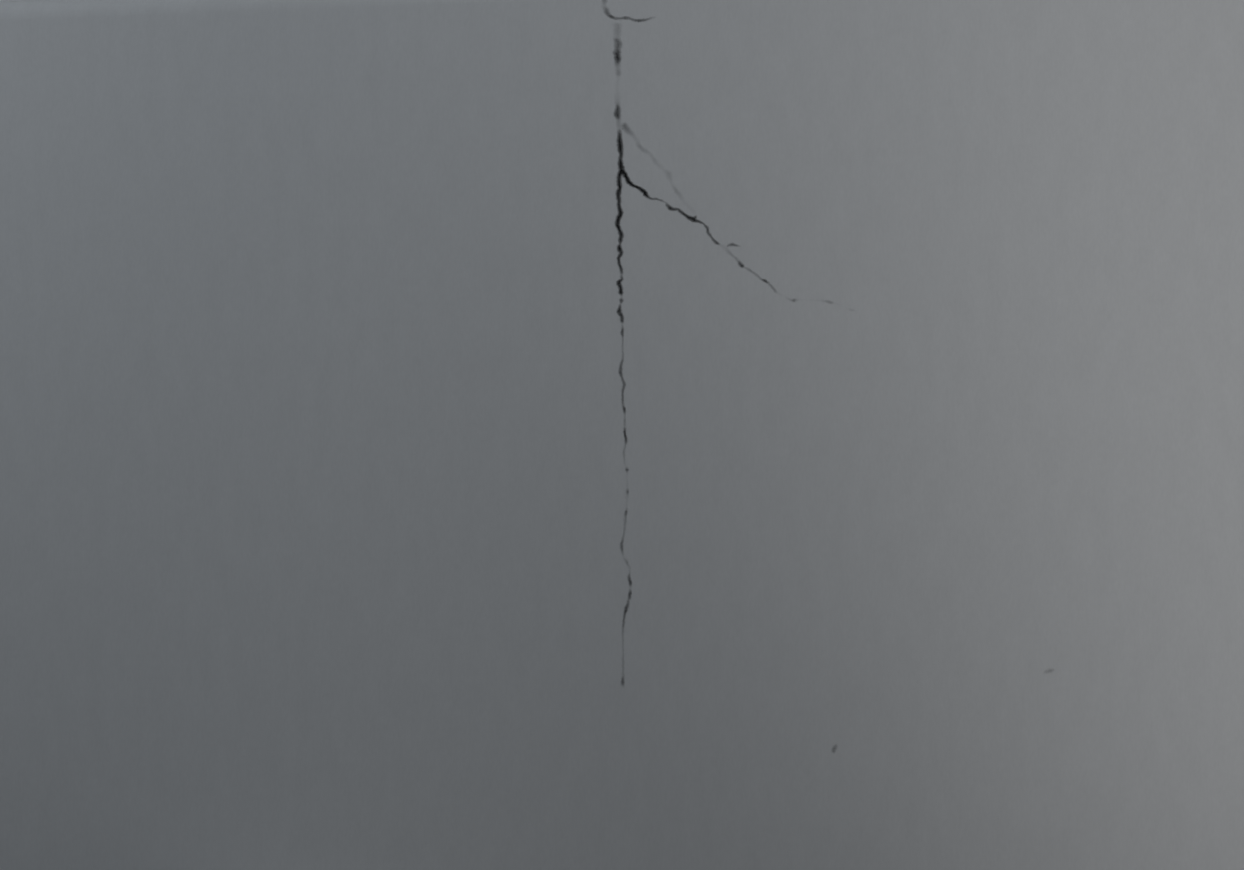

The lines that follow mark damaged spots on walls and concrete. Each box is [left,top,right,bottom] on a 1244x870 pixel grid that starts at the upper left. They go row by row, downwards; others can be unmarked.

crack [615,107,718,332]